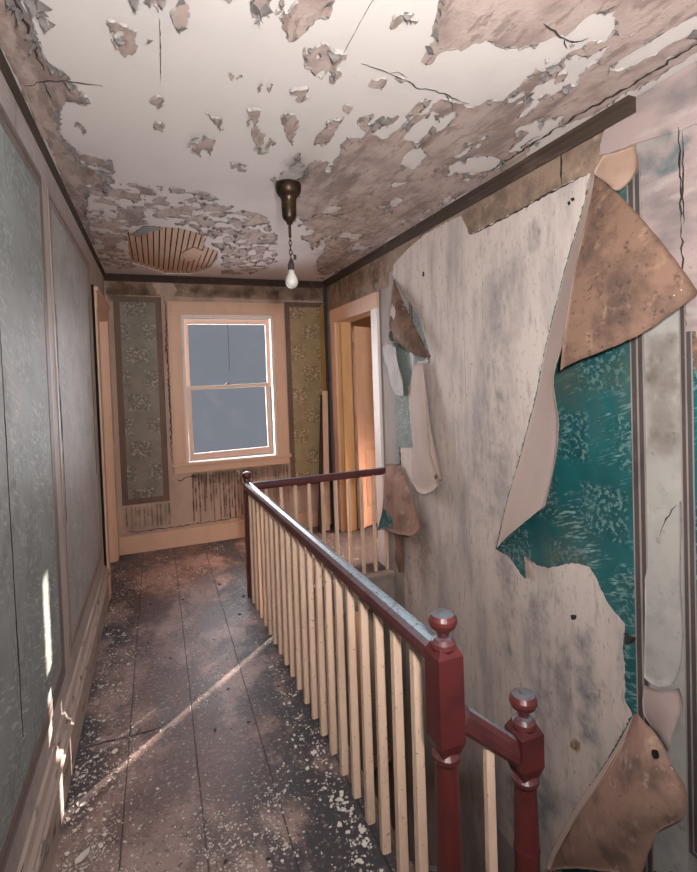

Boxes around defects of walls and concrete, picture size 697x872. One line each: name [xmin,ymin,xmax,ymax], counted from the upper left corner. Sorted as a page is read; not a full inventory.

crack [11,0,100,103]
peeling [250,0,348,85]
peeling [0,0,279,275]
peeling [270,0,697,280]
crack [677,127,685,269]
water stain [192,470,257,521]